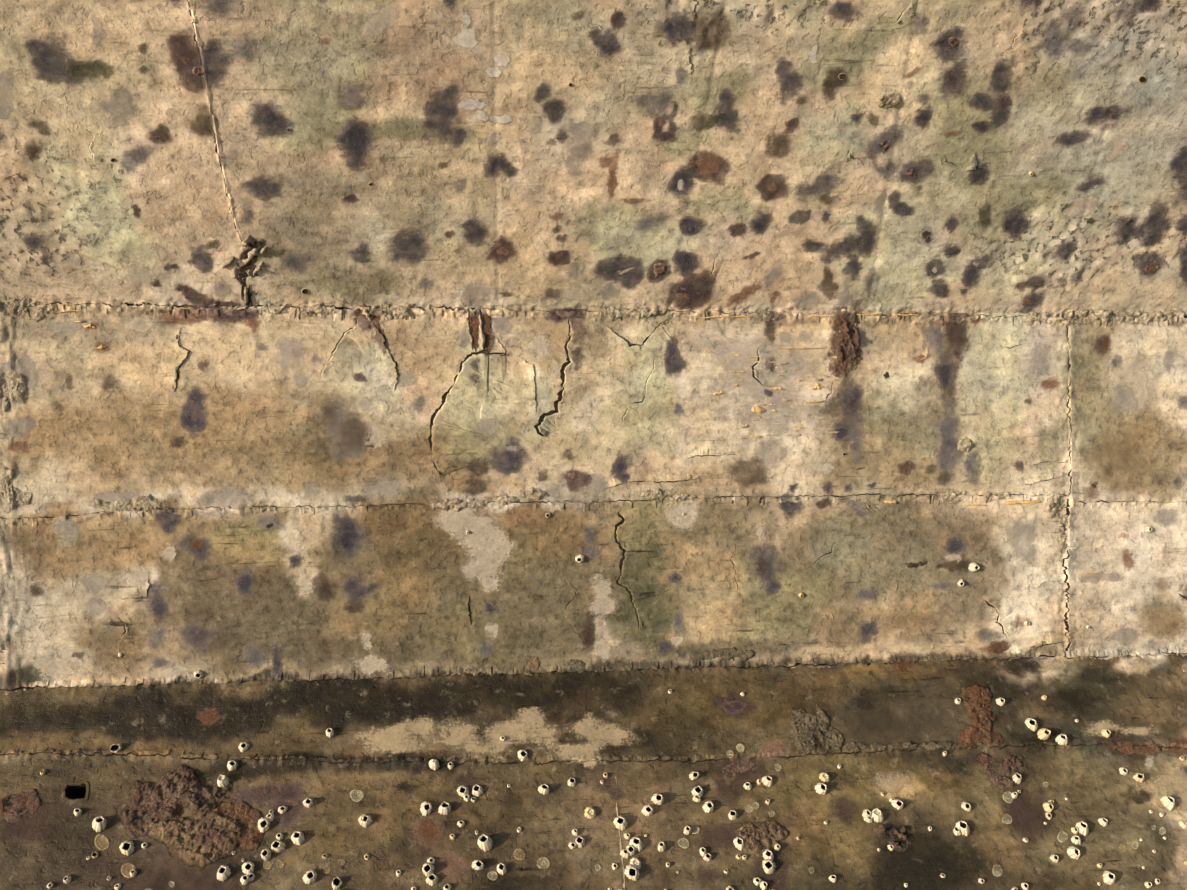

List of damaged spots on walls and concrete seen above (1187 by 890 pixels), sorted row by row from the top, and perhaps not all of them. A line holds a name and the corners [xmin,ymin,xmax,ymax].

water stain [24,33,112,85]
water stain [850,26,1012,216]
water stain [593,253,644,289]
water stain [801,215,876,311]
water stain [925,215,993,298]
water stain [1114,146,1187,284]
crack [428,317,678,492]
corrosion [823,310,863,378]
crack [605,447,735,629]
crack [1179,581,1187,597]
corrosion [956,684,1053,843]
corrosion [120,764,307,890]